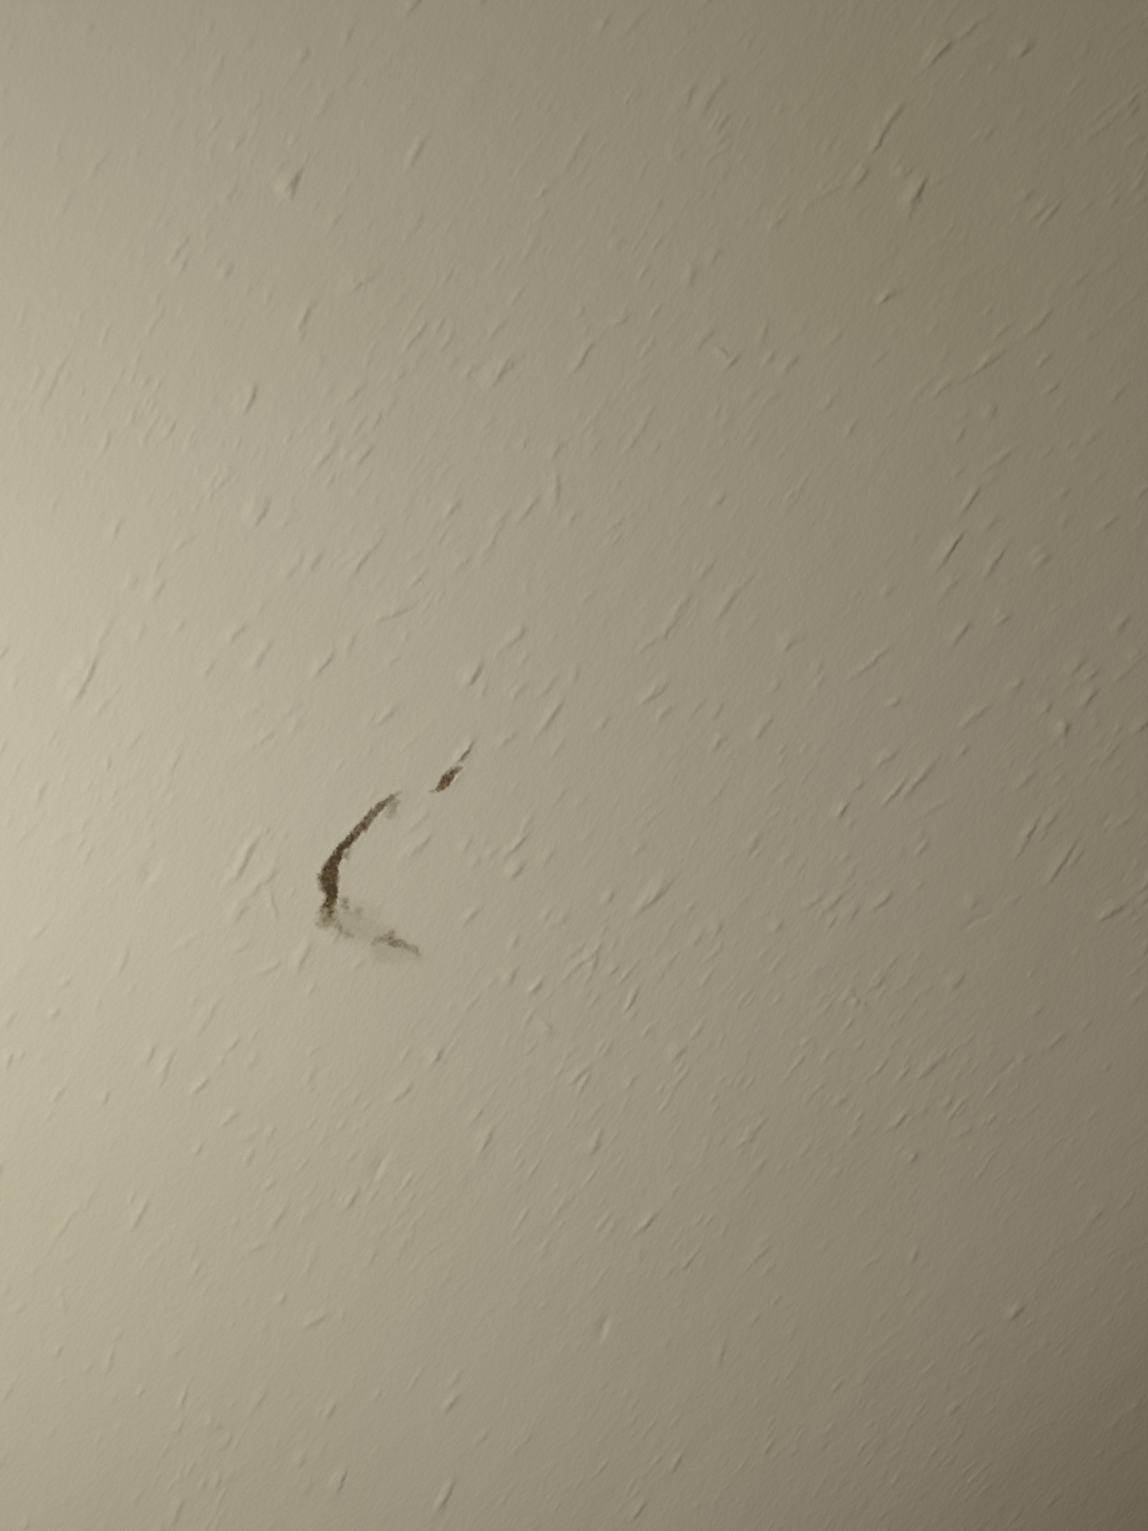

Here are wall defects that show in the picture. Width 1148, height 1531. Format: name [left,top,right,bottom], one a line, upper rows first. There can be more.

crack [307,742,478,970]